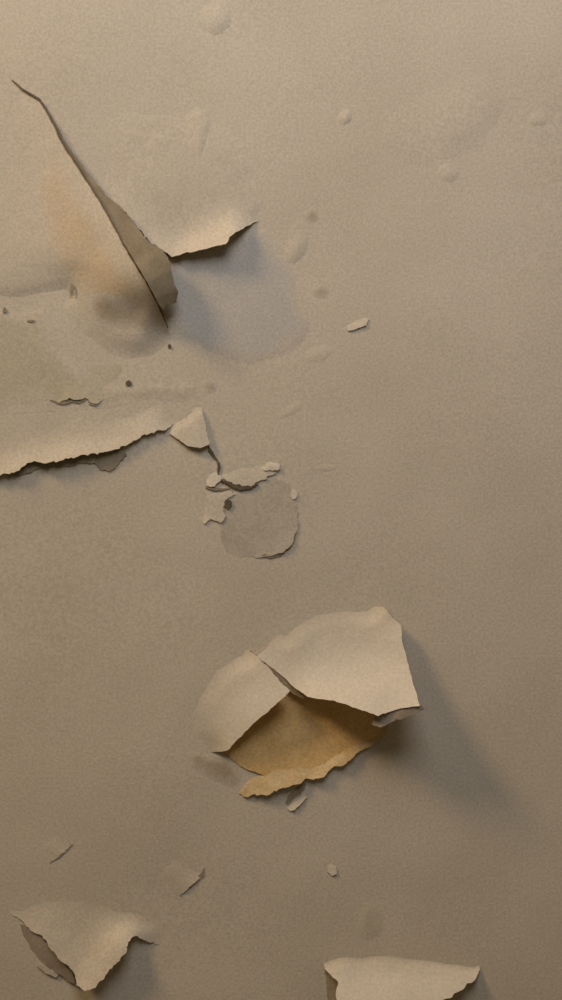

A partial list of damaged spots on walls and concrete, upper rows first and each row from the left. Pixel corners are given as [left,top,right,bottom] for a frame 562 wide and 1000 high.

peeling [0,80,311,406]
peeling [0,405,210,477]
peeling [202,462,298,558]
peeling [192,607,425,811]
peeling [10,898,161,991]
peeling [324,956,480,1000]